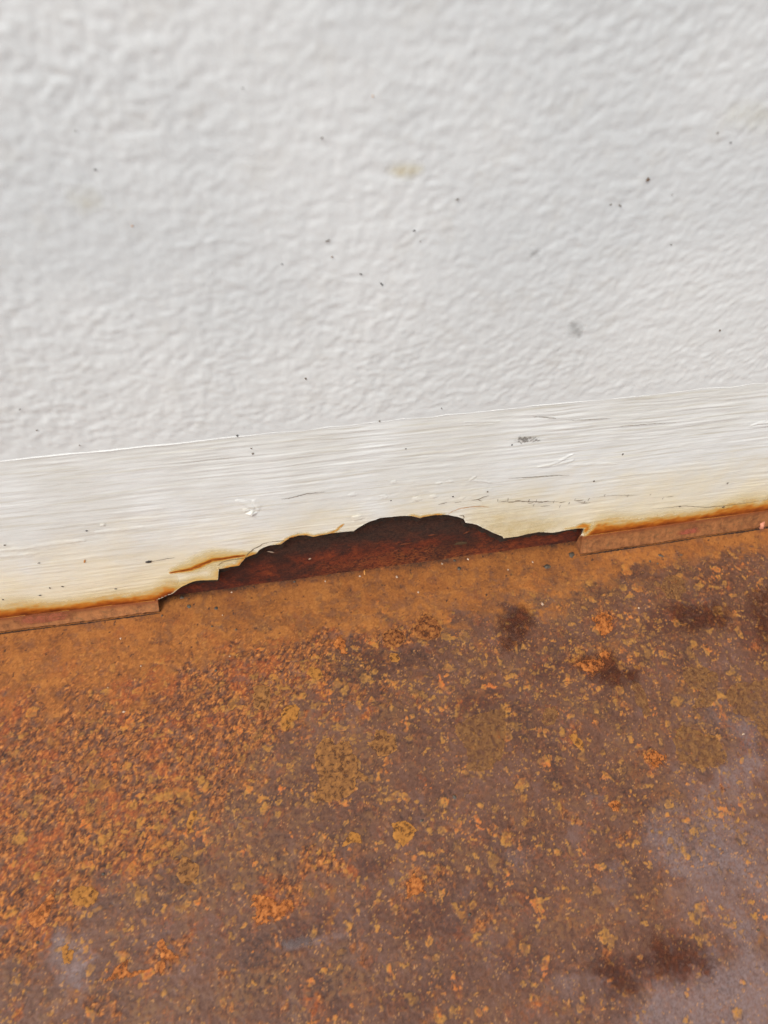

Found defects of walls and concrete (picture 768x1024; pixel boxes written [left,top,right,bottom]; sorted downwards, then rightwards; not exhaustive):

rust [278,524,344,544]
spalling [158,515,584,600]
rust [0,552,256,618]
rust [576,612,637,684]
rust [313,738,368,803]
rust [342,832,362,847]
rust [392,821,417,847]
rust [406,873,426,899]
rust [28,886,99,928]
rust [250,894,295,925]
rust [61,944,74,964]
rust [106,960,144,981]